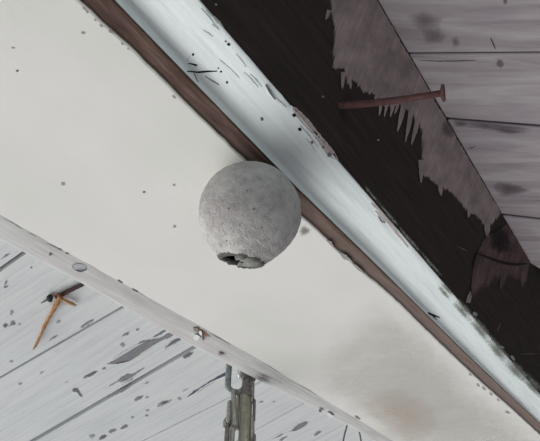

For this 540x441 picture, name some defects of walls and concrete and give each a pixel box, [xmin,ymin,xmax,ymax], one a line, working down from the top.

peeling [236,54,338,160]
peeling [367,189,419,250]
peeling [72,263,87,272]
peeling [84,330,181,378]
spalling [193,328,222,341]
peeling [107,368,144,397]